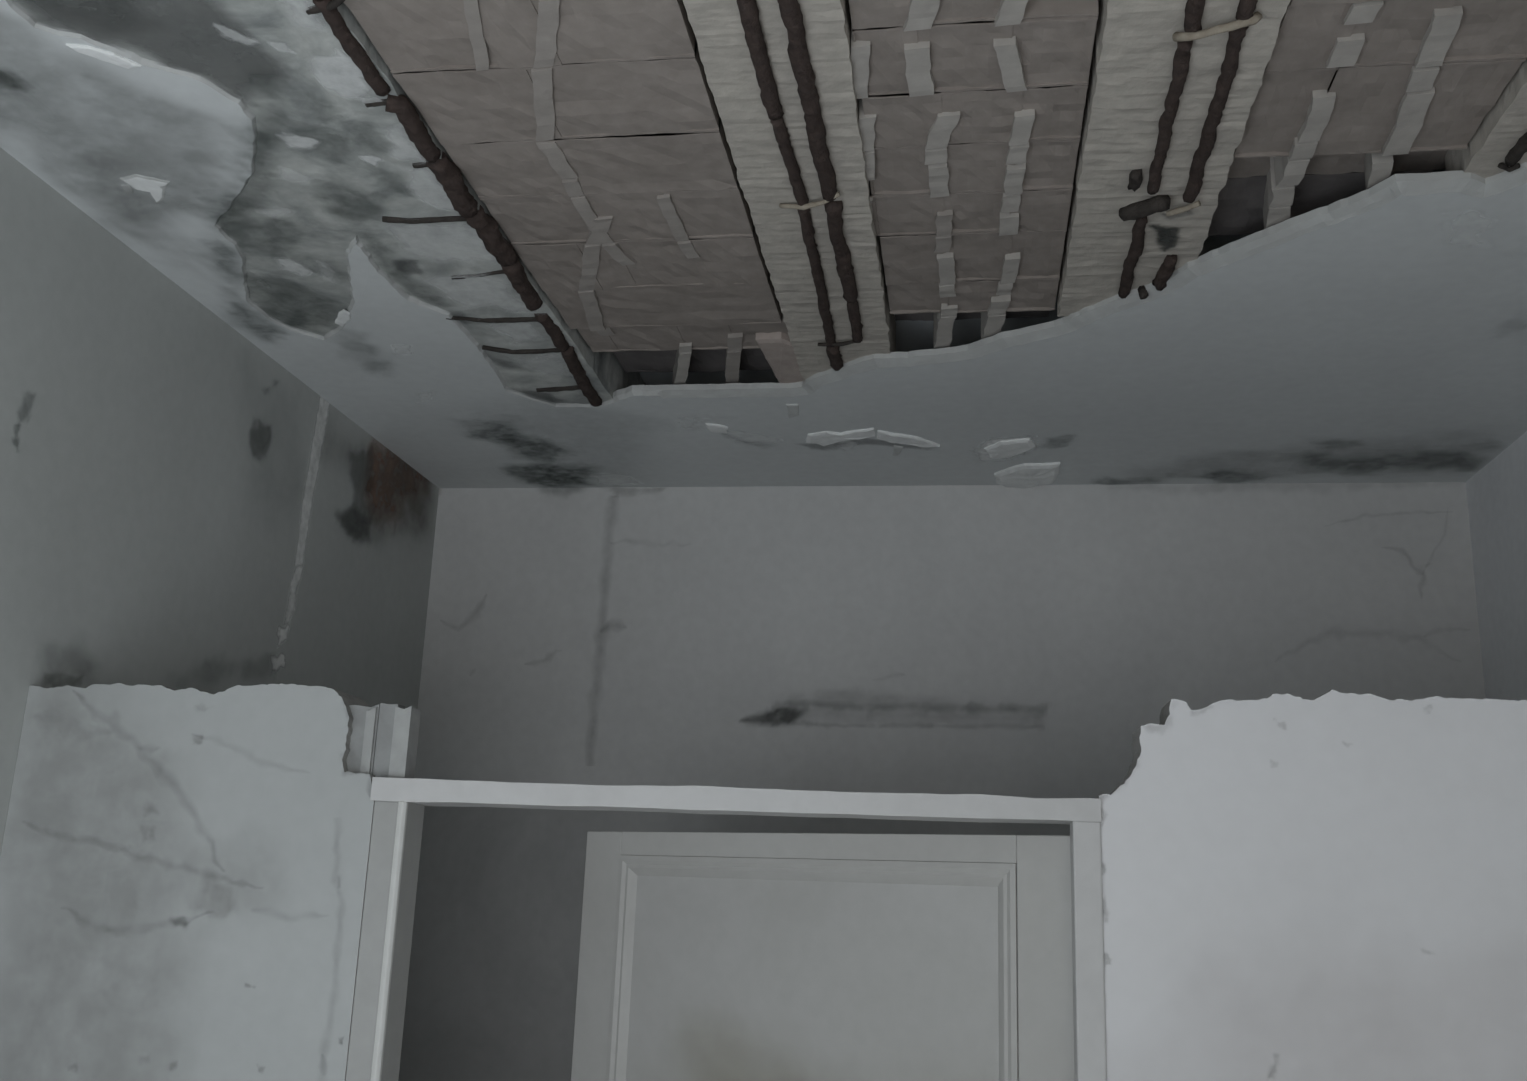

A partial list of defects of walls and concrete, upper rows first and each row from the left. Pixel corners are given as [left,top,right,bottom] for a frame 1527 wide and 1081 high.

spalling [6,0,1527,418]
peeling [806,428,940,456]